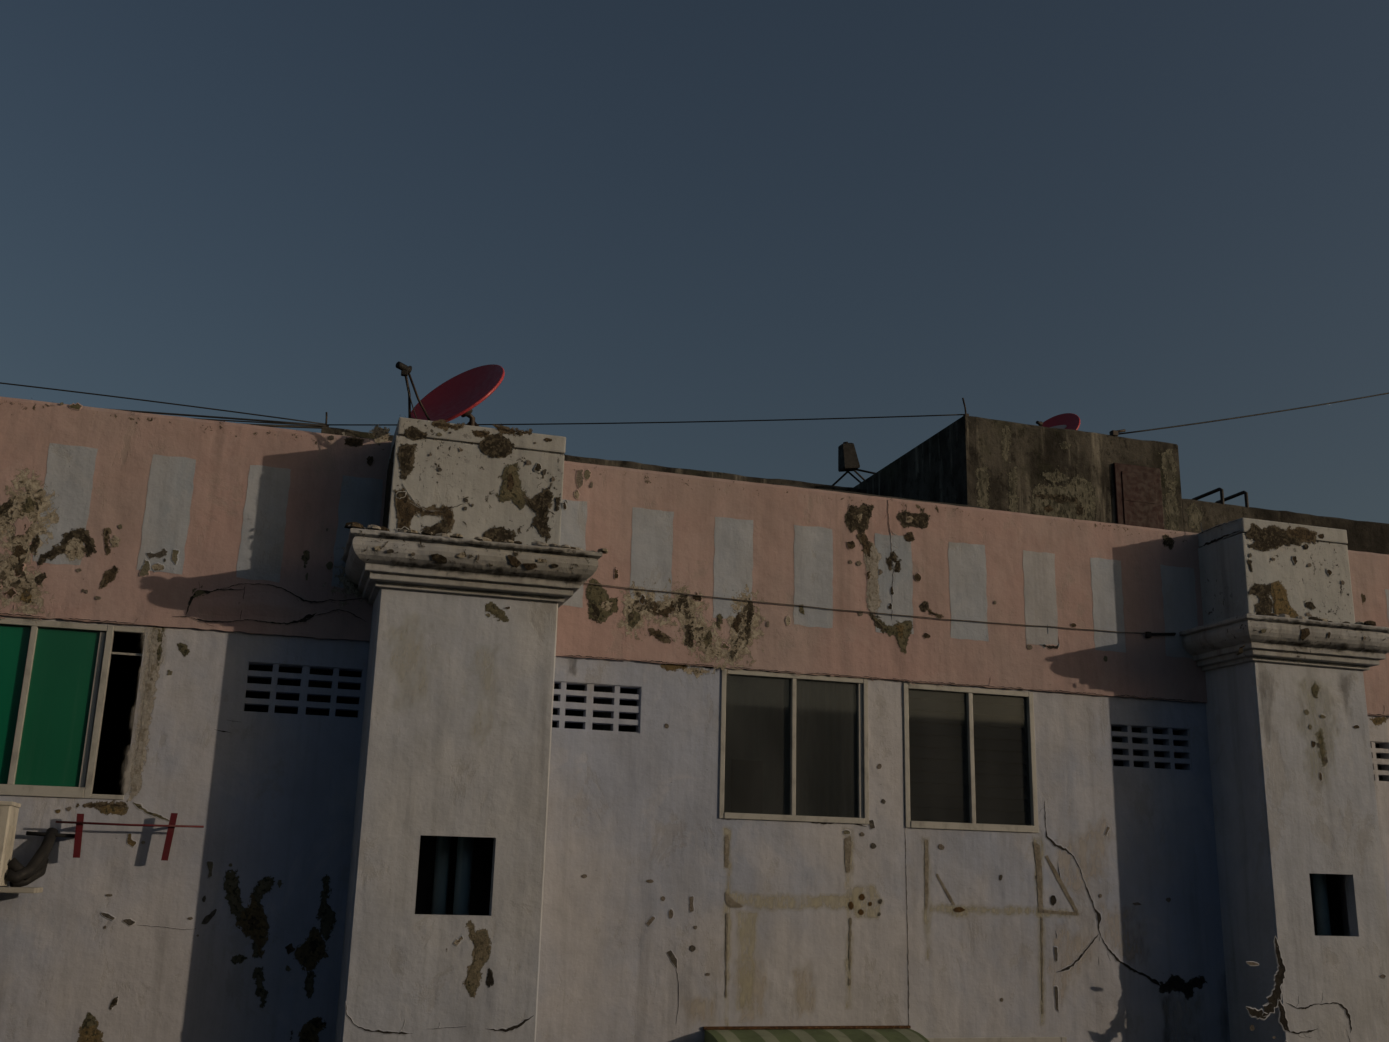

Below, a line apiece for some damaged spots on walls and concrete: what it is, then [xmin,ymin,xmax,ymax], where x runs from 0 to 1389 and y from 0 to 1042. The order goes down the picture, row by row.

spalling [327,419,593,539]
spalling [0,467,122,624]
crack [0,605,139,625]
crack [173,582,367,626]
peeling [586,567,805,678]
peeling [844,503,944,654]
crack [1040,624,1060,650]
spalling [1245,523,1345,641]
crack [563,654,1200,1025]
peeling [187,861,337,1008]
peeling [446,920,494,999]
crack [1246,936,1353,1042]